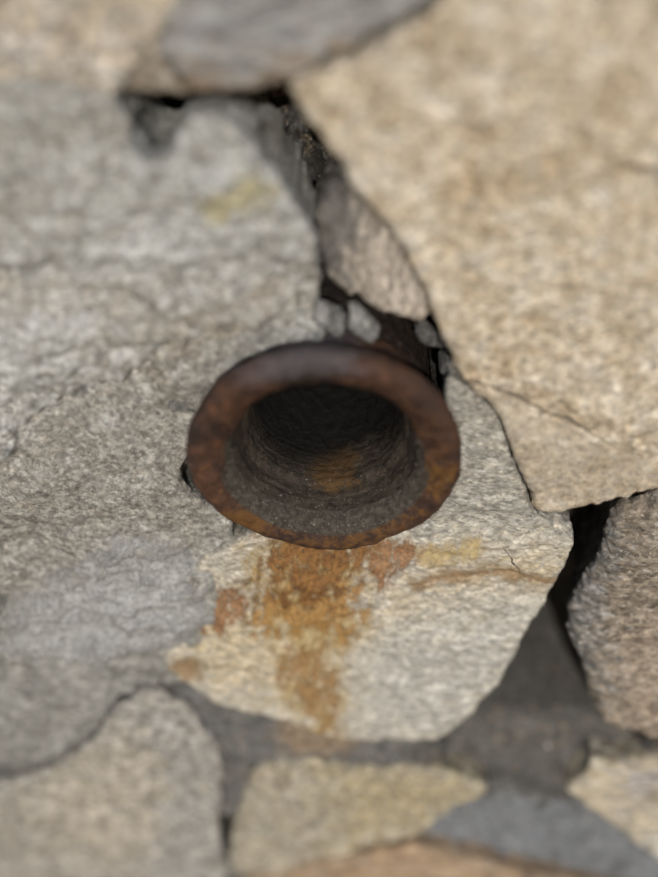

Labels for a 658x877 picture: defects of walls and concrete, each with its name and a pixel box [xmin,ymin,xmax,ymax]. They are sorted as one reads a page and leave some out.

crack [469,380,611,444]
rust [201,539,479,738]